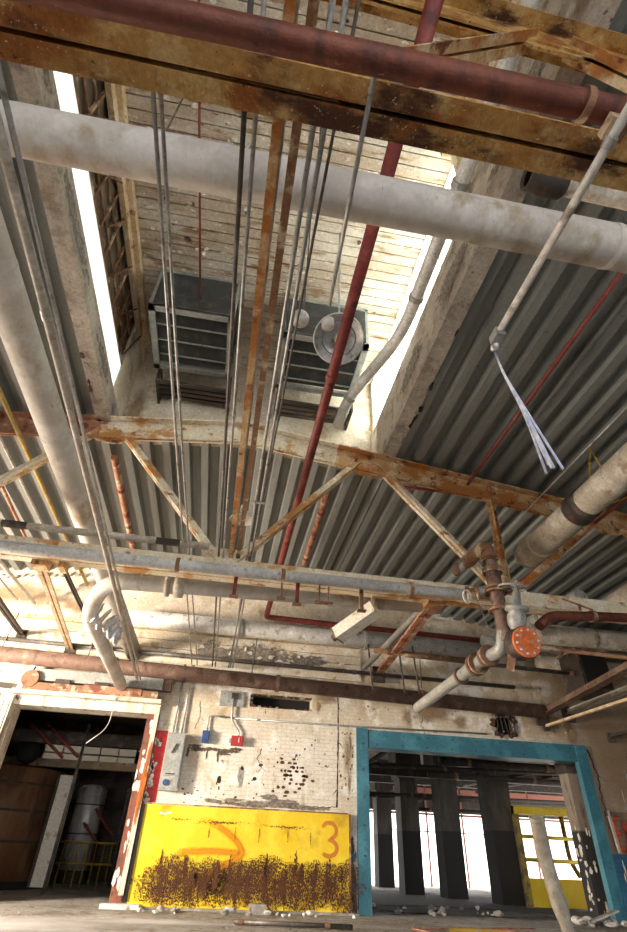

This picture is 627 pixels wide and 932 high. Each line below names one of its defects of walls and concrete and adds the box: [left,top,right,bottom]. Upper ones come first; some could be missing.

corrosion [11,0,627,126]
damp [197,640,327,666]
spalling [488,714,519,740]
peeling [132,720,168,804]
spalling [248,740,316,799]
peeling [111,867,121,891]